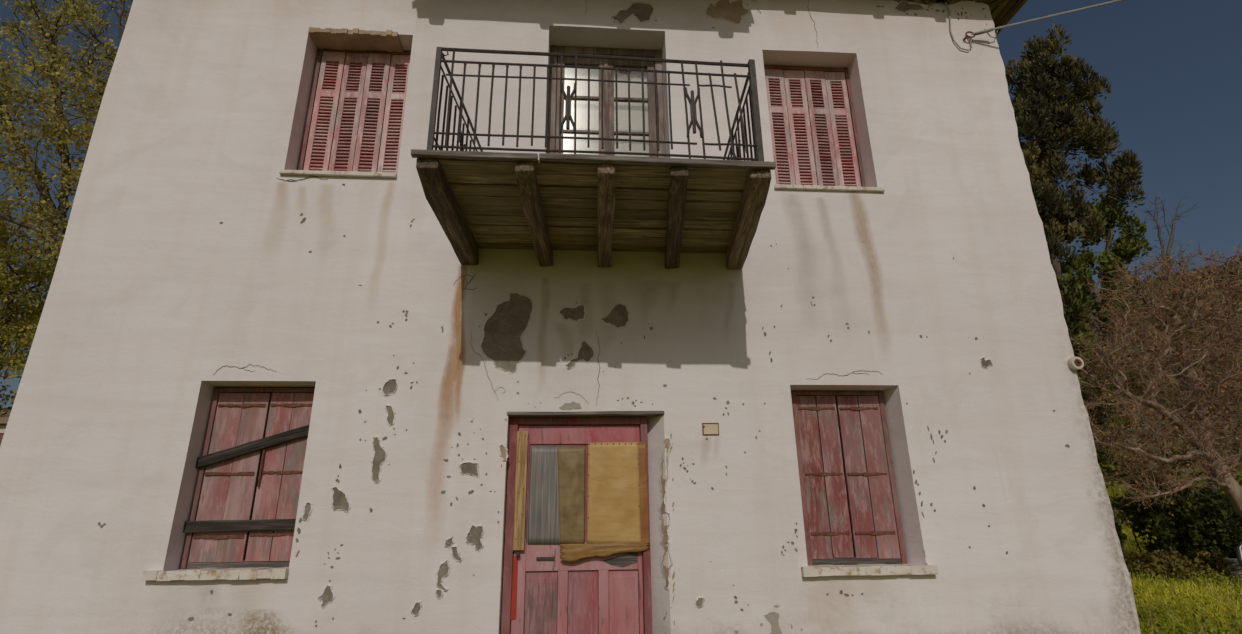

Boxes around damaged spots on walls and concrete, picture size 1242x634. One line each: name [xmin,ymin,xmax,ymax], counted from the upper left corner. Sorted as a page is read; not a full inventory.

flaking render [611,2,657,24]
spalling [704,0,761,29]
corrosion [446,267,465,389]
flaking render [479,292,541,407]
flaking render [558,301,587,323]
flaking render [564,340,595,370]
flaking render [601,302,630,344]
flaking render [359,355,418,484]
flaking render [331,464,351,514]
flaking render [296,500,313,557]
spalling [658,434,696,634]
flaking render [760,605,803,634]